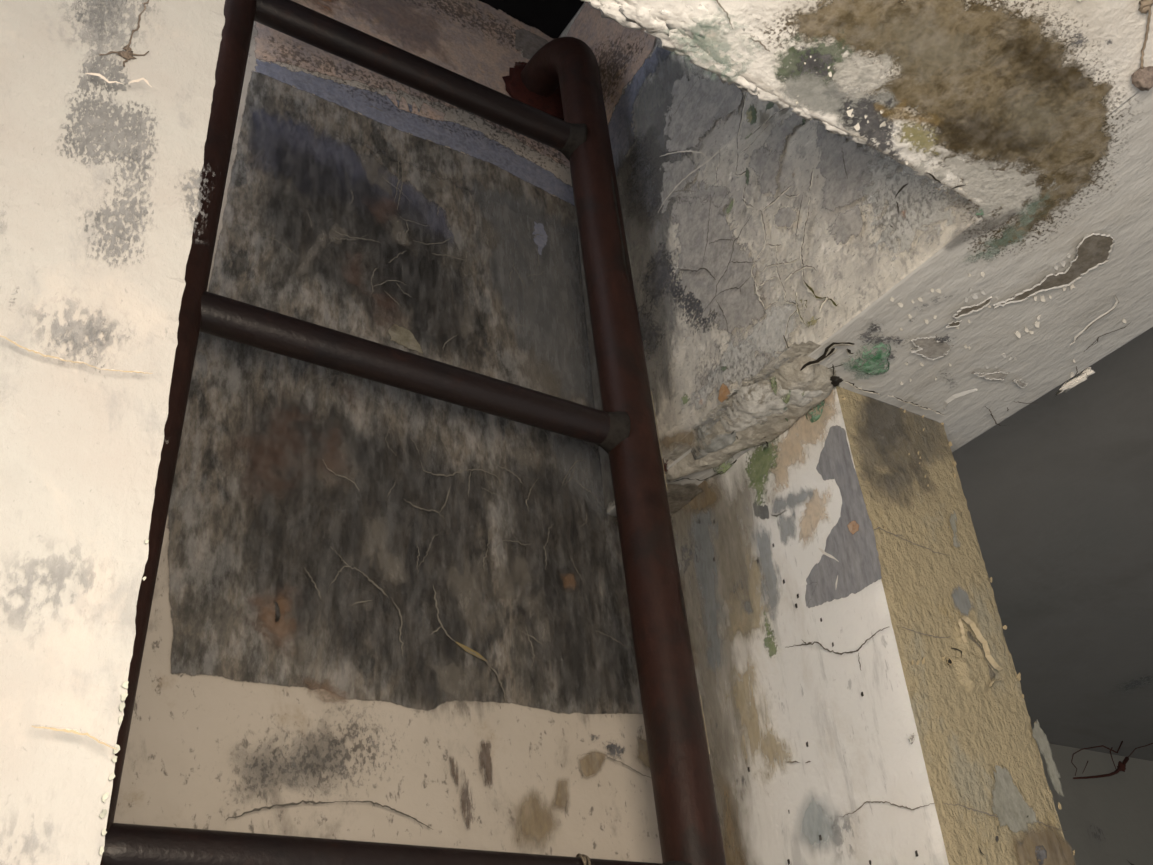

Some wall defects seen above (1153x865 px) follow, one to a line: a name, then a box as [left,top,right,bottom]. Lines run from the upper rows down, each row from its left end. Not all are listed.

water stain [61,54,157,264]
water stain [208,71,603,411]
water stain [616,51,717,413]
crack [673,92,943,415]
water stain [764,0,1123,257]
spalling [890,233,1115,388]
water stain [166,332,643,714]
peeling [722,541,768,641]
peeling [753,390,882,608]
crack [785,625,951,670]
crack [226,800,432,829]
peeling [1032,720,1063,809]